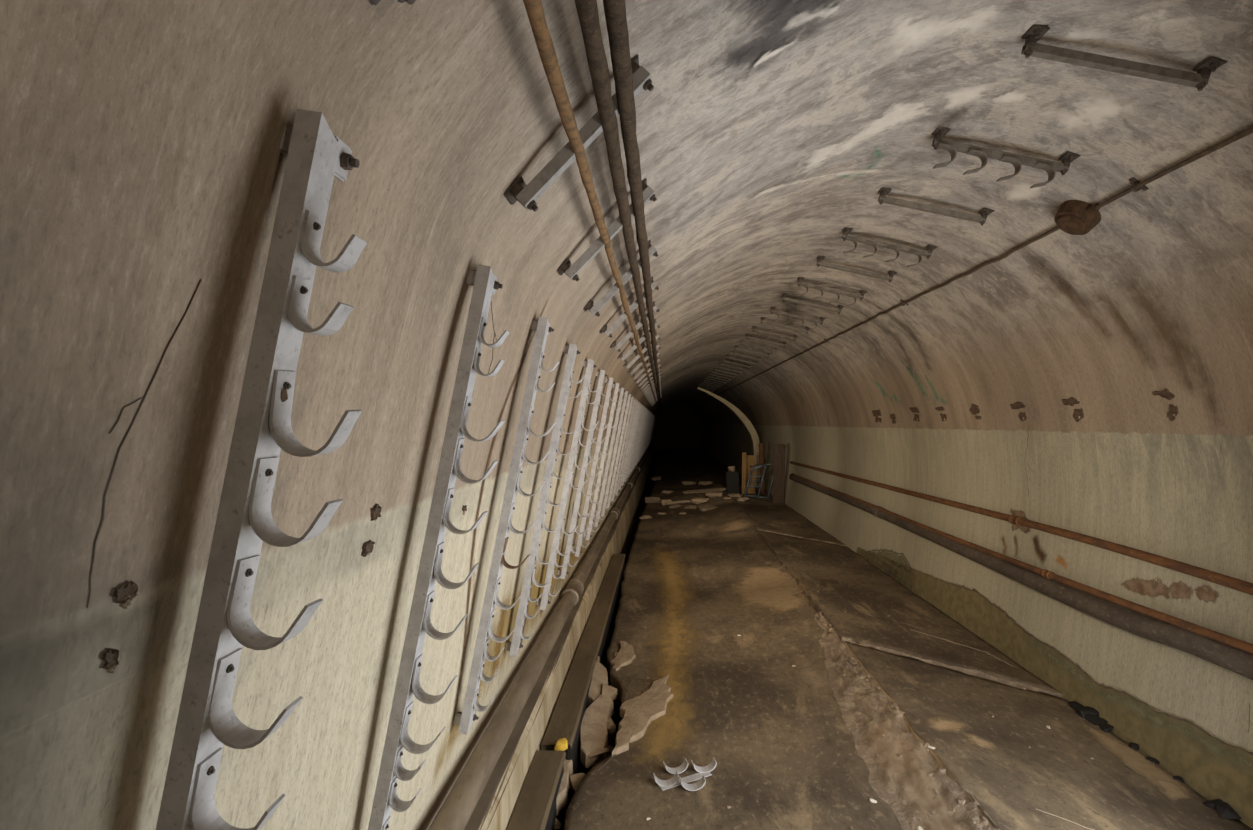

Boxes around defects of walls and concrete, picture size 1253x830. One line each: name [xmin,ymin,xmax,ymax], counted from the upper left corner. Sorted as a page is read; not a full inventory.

water stain [728,0,839,70]
crack [86,279,202,608]
flaking render [857,548,1253,829]